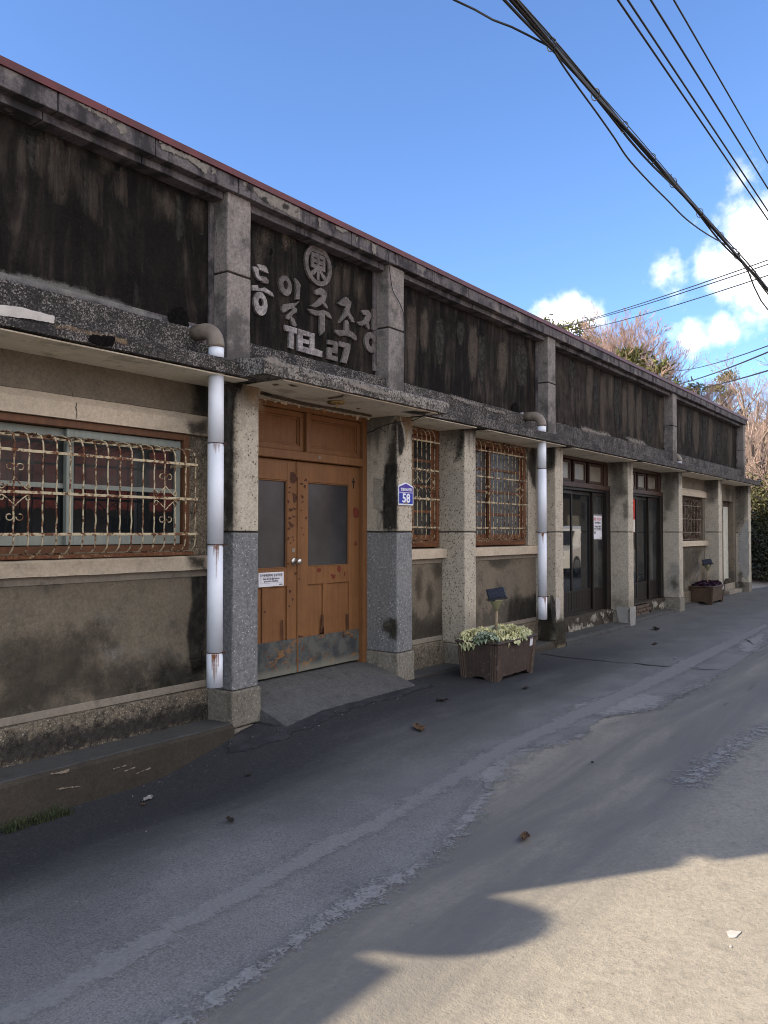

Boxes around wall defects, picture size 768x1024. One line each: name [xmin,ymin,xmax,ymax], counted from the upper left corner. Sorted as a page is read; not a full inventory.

water stain [374,416,406,531]
water stain [136,576,207,692]
peeling [568,609,613,633]